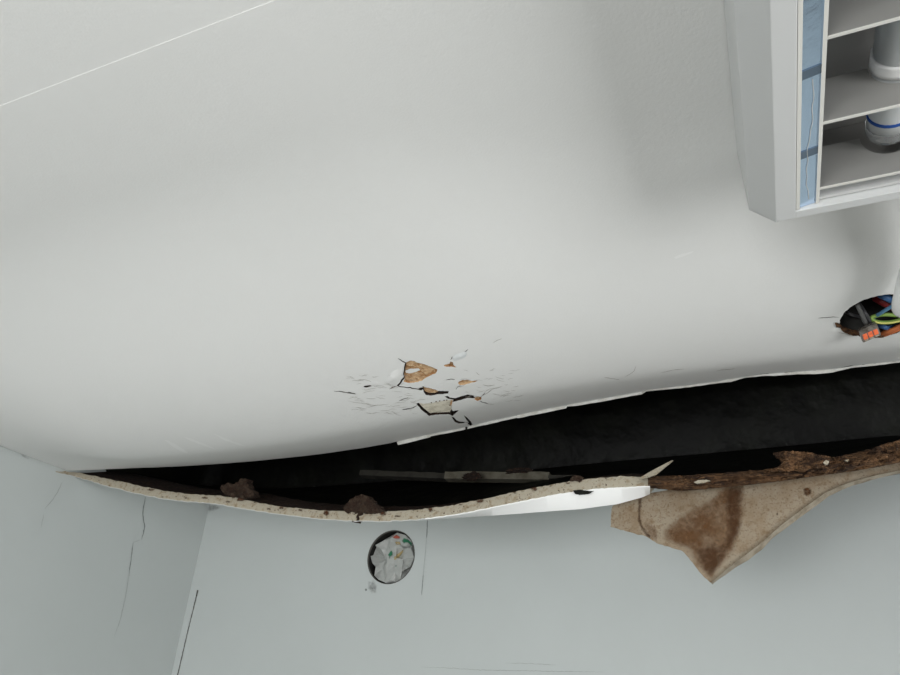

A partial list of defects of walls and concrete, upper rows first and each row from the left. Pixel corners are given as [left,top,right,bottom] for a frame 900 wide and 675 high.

peeling [404,361,454,413]
peeling [867,440,900,454]
crack [114,497,146,637]
water stain [668,488,741,569]
peeling [610,451,900,584]